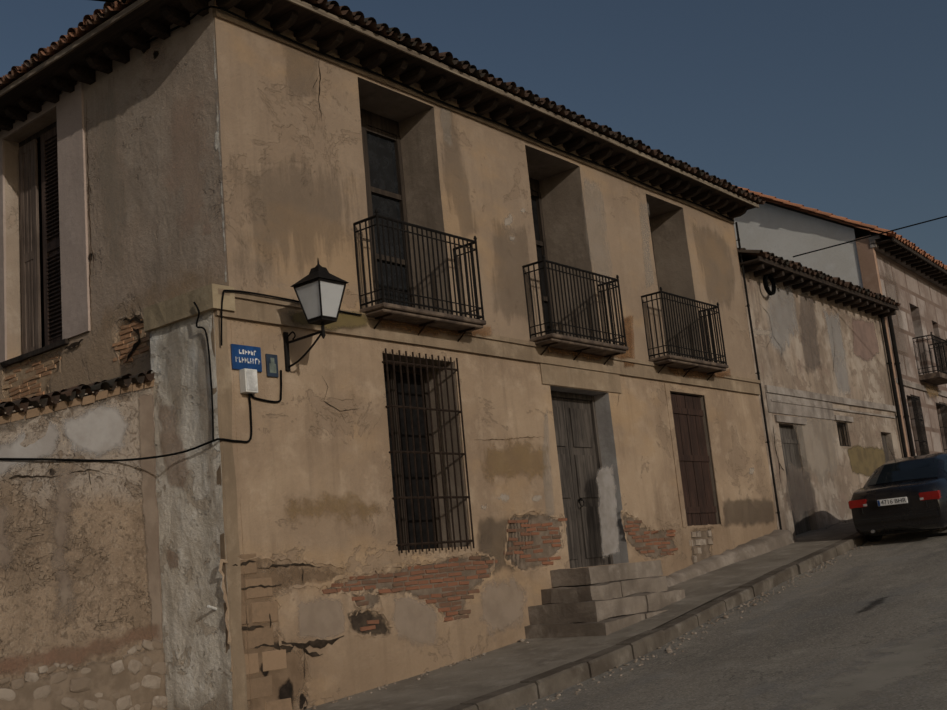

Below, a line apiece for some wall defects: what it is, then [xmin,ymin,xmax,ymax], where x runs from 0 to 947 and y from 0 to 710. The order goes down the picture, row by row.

crack [313,59,322,118]
flaking render [112,311,151,371]
flaking render [0,339,83,403]
damp [486,442,545,477]
flaking render [621,509,679,564]
spalling [689,524,715,563]
flaking render [219,495,567,710]
crack [255,636,343,657]